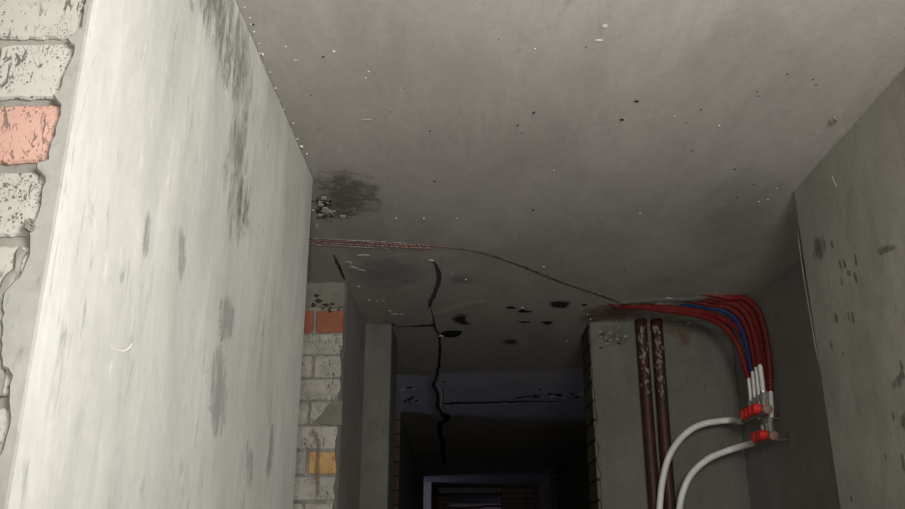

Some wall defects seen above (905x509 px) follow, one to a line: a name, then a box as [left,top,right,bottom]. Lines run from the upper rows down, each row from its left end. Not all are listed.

crack [309,238,632,467]